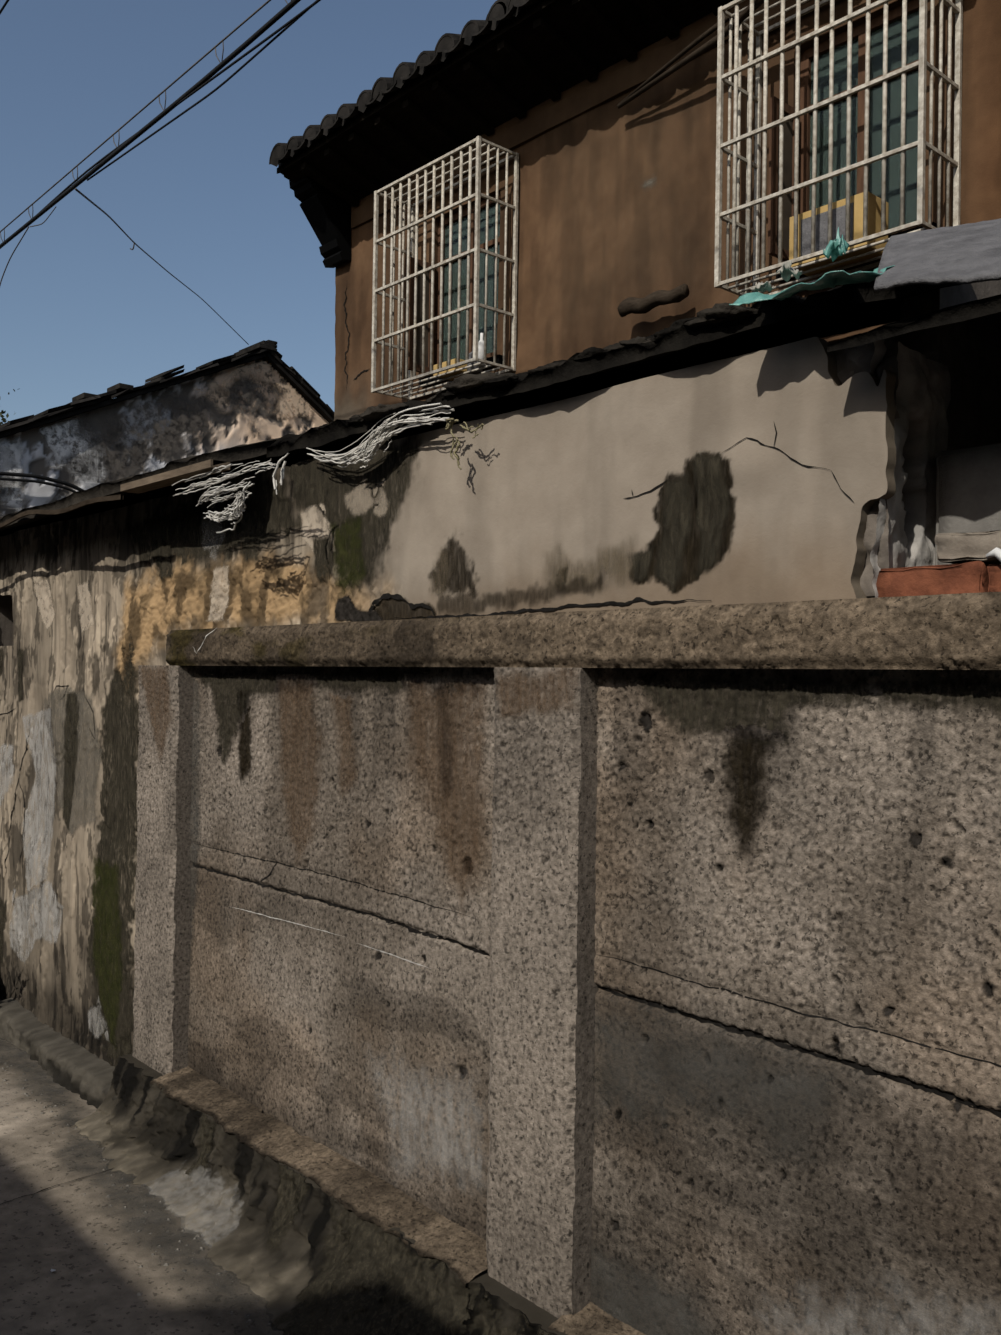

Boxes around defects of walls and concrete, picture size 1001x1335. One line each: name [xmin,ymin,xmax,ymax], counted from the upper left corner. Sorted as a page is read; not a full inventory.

peeling [196,360,311,418]
spalling [833,335,901,419]
peeling [0,441,24,508]
peeling [41,420,106,487]
crack [623,480,667,499]
damp [557,452,735,593]
crack [722,423,853,501]
spalling [860,499,889,596]
damp [33,577,55,629]
damp [62,693,79,832]
damp [189,667,457,933]
damp [87,643,139,1066]